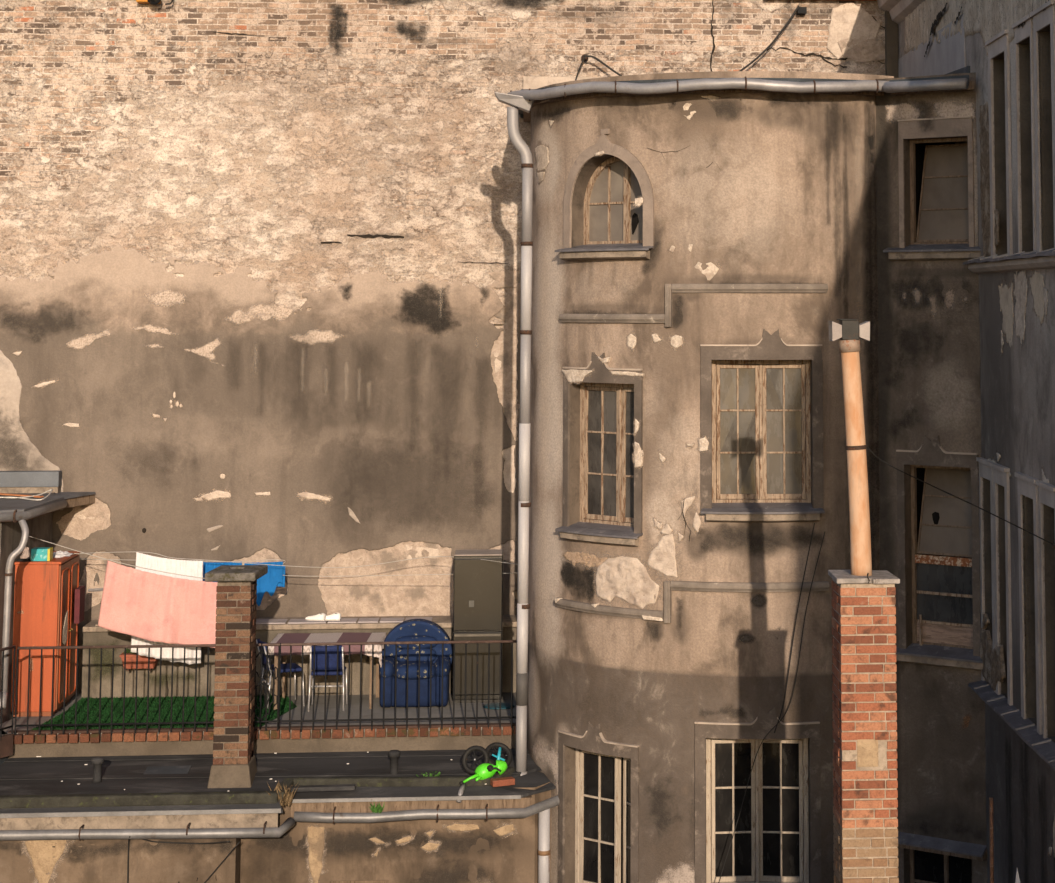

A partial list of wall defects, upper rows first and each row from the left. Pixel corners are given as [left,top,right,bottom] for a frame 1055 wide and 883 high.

crack [708,0,716,72]
crack [767,47,848,68]
spalling [0,0,885,493]
peeling [999,270,1048,354]
spalling [564,550,608,569]
spalling [318,541,453,617]
spalling [370,830,441,856]
spalling [446,823,479,832]
spalling [493,824,515,836]